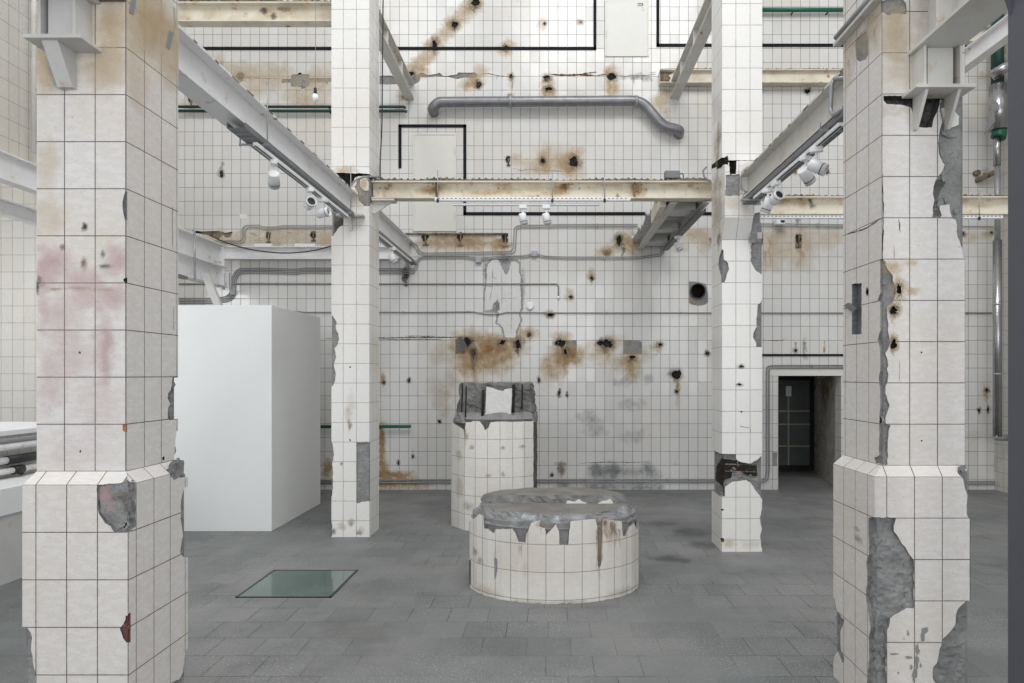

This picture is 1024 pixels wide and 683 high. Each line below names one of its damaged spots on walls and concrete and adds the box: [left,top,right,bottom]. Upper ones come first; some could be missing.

crack [549,71,654,79]
rust [539,152,578,194]
spalling [932,98,961,245]
spalling [750,214,761,274]
rust [450,332,532,372]
rust [547,339,582,372]
spalling [876,263,895,464]
spalling [512,384,523,413]
rust [379,428,417,488]
spalling [714,451,759,496]
spalling [99,476,134,532]
spalling [869,517,965,683]